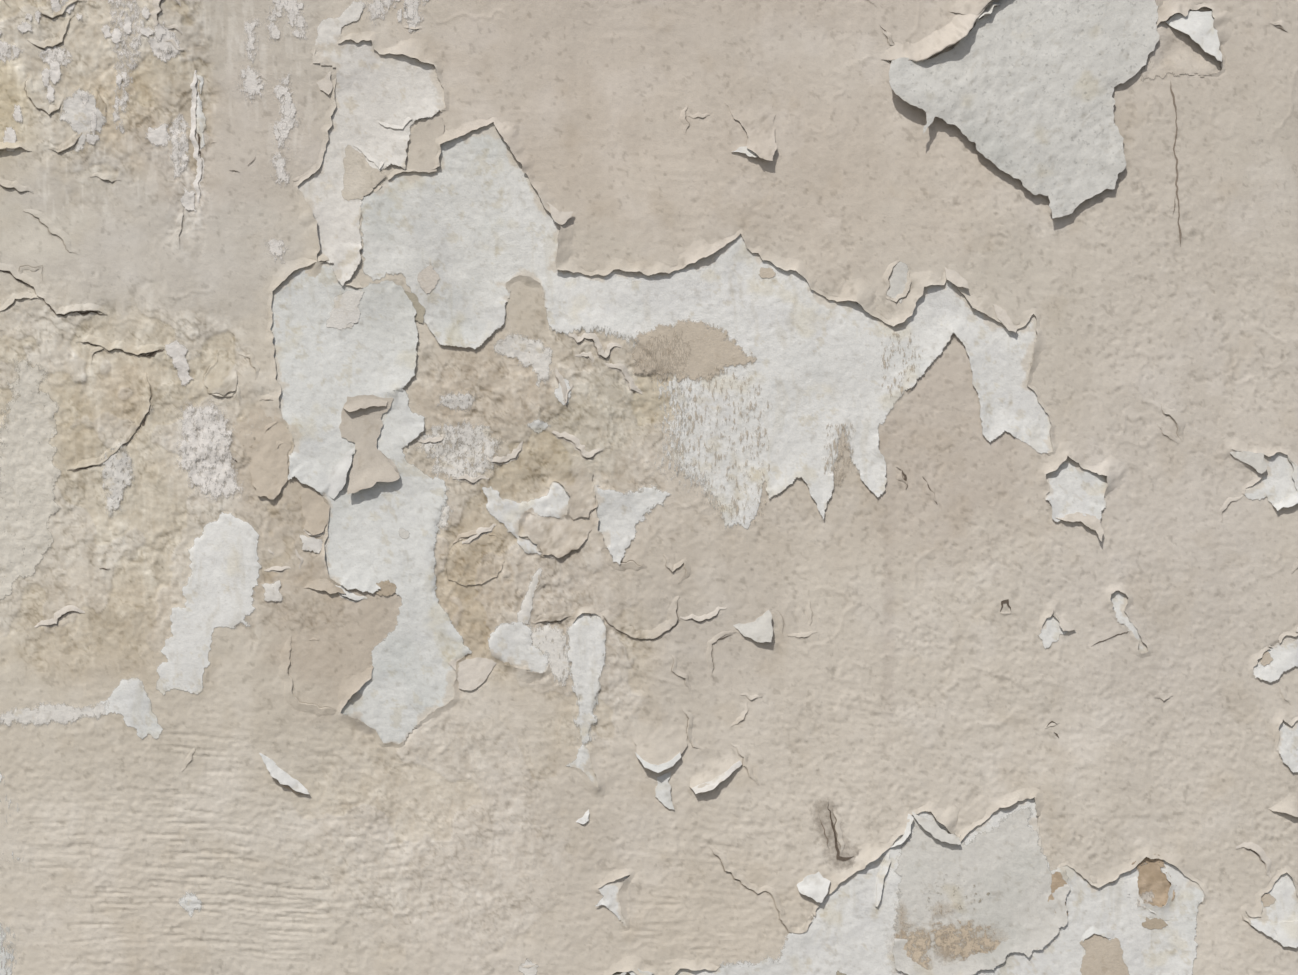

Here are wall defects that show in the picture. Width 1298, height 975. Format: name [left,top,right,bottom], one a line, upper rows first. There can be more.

spalling [1140,0,1233,81]
crack [1170,86,1182,247]
peeling [100,1,1127,824]
spalling [1216,437,1298,522]
spalling [1247,626,1298,773]
spalling [591,868,636,931]
peeling [603,787,1211,975]
spalling [1236,842,1298,948]